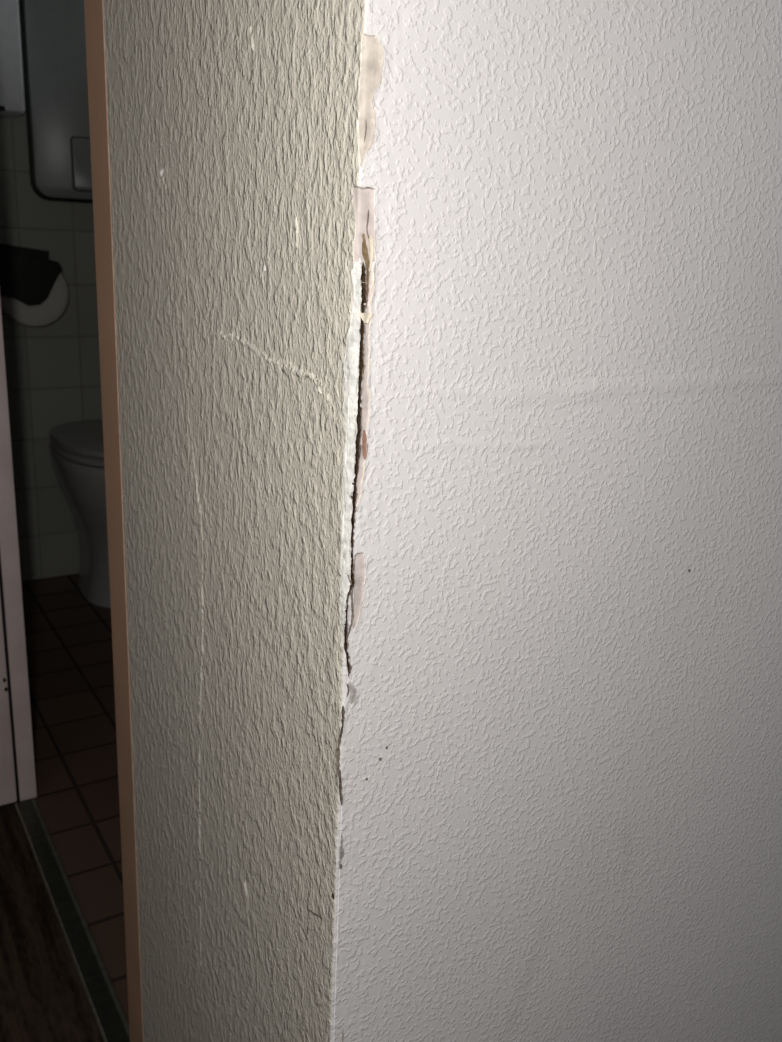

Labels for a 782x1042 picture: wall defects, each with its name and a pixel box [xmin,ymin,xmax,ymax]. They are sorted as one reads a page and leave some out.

peeling [359,34,384,167]
crack [336,263,373,805]